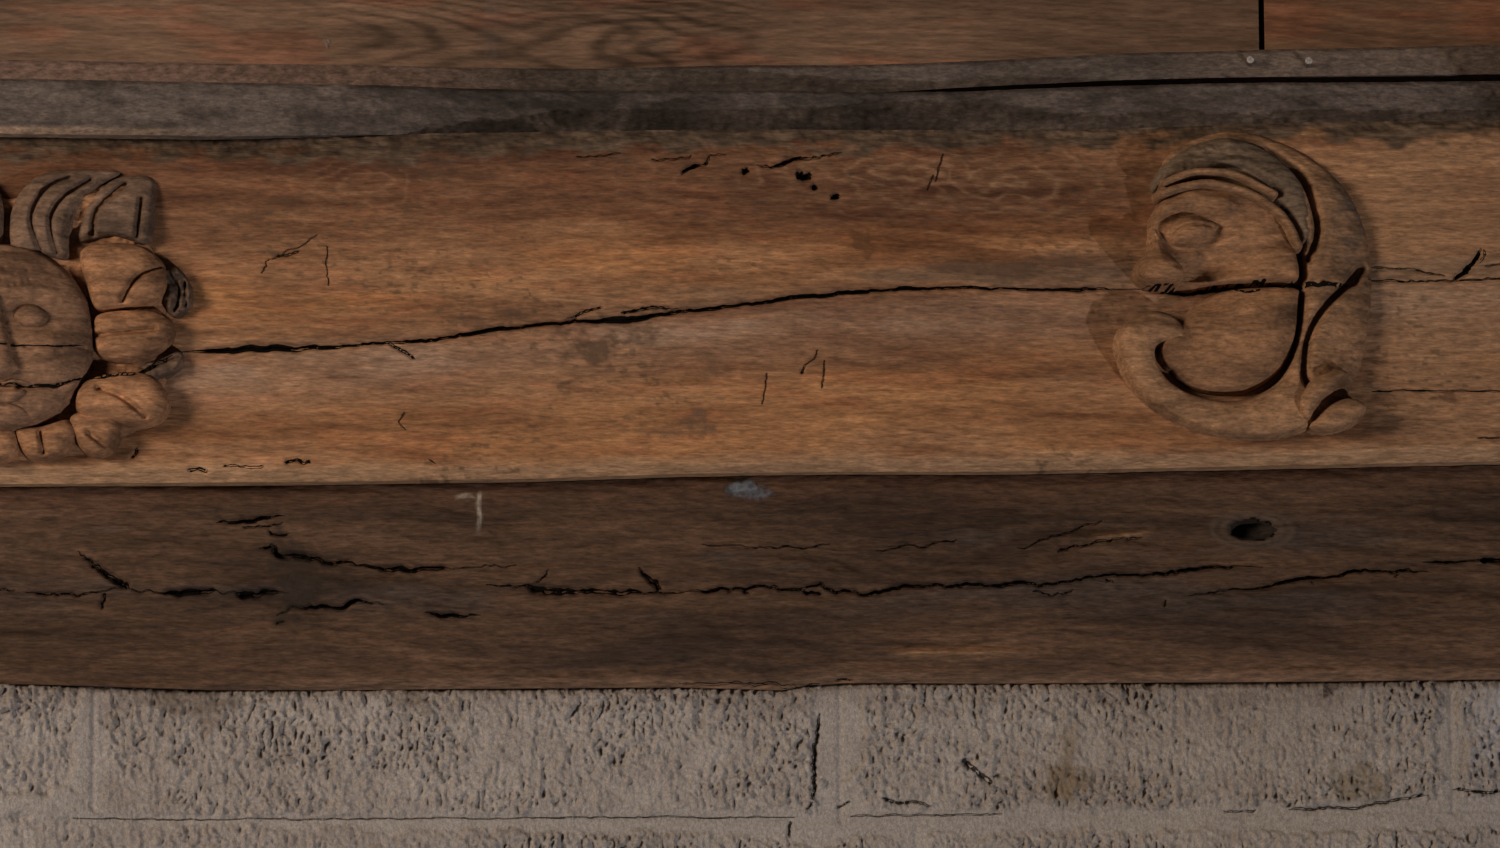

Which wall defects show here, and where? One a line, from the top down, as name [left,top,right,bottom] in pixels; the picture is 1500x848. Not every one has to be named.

crack [0,264,1500,389]
crack [187,458,310,473]
crack [0,515,1500,624]